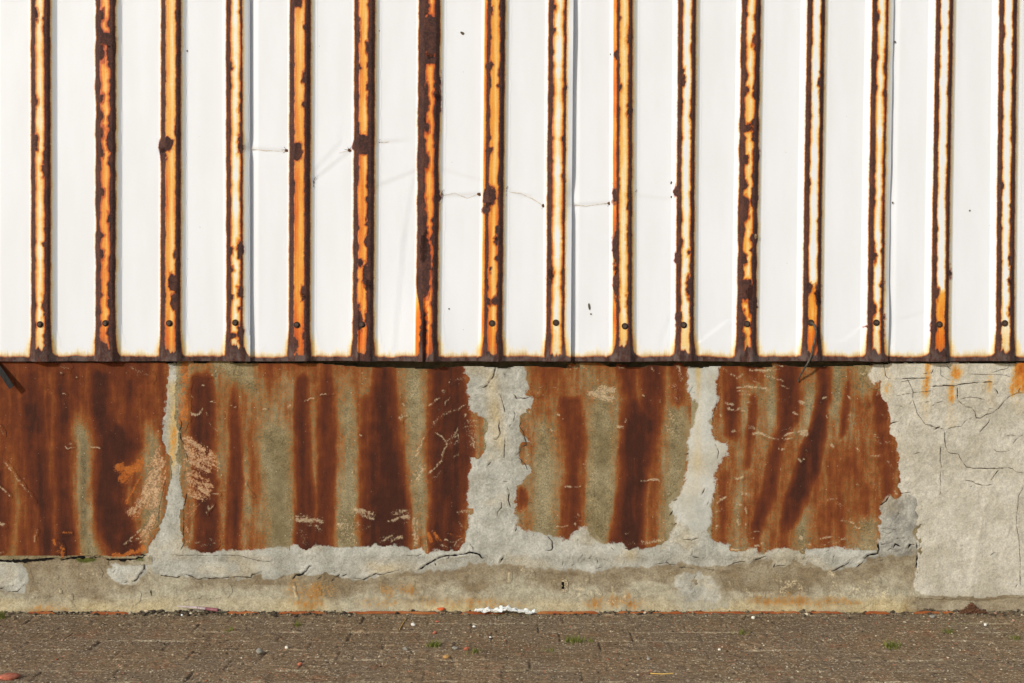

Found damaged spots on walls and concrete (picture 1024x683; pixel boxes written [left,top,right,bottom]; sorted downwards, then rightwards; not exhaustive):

corrosion [250,0,1024,362]
corrosion [0,0,467,556]
corrosion [520,363,691,541]
corrosion [713,364,898,549]
peeling [864,364,881,389]
crack [884,363,1023,556]
crack [0,547,504,593]